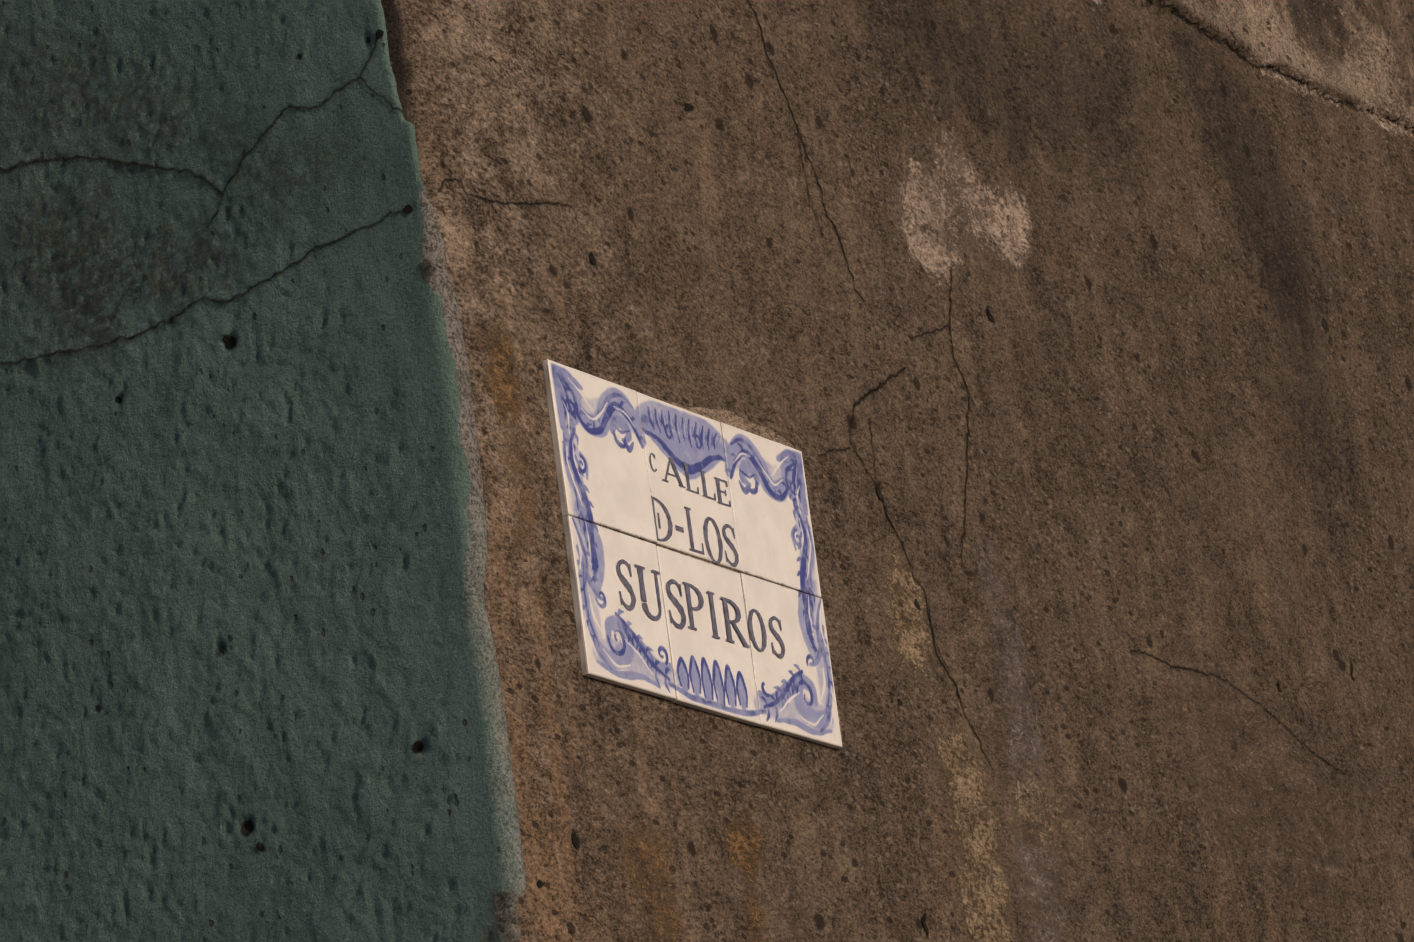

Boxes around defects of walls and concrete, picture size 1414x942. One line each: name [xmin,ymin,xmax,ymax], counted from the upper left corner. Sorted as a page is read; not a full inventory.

crack [0,38,404,228]
crack [438,178,573,216]
crack [1,209,405,364]